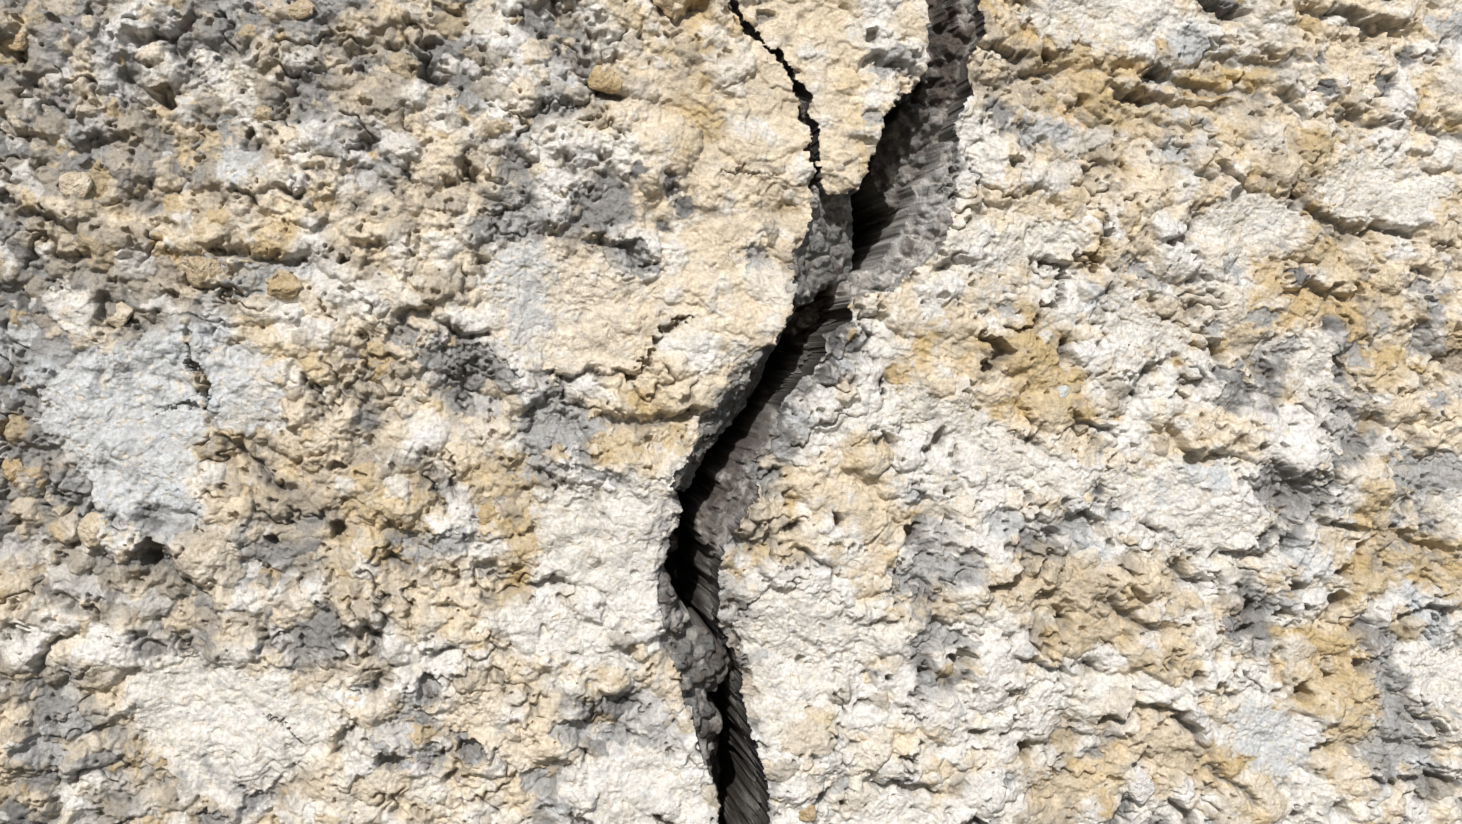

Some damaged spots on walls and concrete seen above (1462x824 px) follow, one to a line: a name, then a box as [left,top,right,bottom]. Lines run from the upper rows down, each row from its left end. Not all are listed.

crack [625,316,695,384]
crack [657,0,987,824]